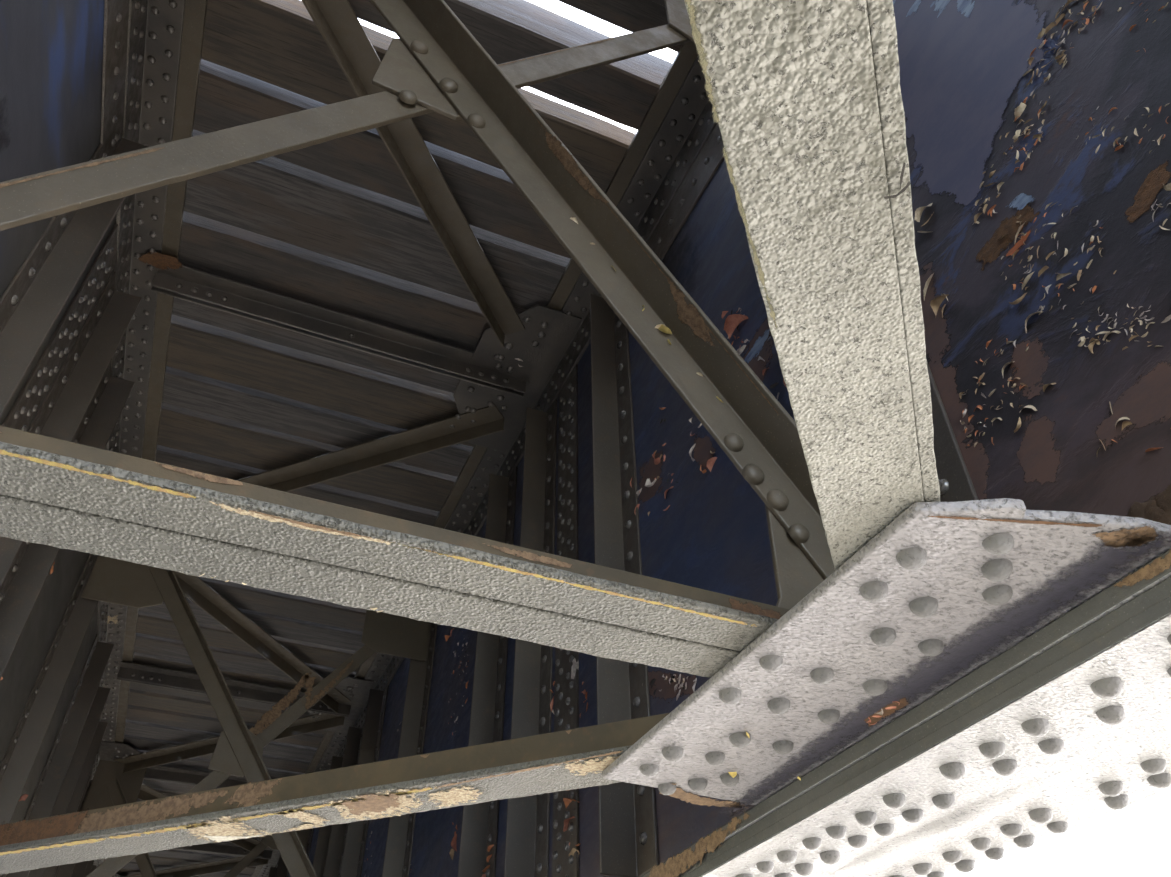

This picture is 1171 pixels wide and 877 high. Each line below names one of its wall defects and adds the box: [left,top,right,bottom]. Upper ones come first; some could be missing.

peeling [892,0,1103,233]
peeling [1076,103,1170,153]
peeling [1151,183,1171,230]
peeling [721,307,787,400]
peeling [920,202,1171,500]
peeling [689,418,717,474]
rust [928,484,1171,548]
rust [1114,550,1171,588]
peeling [557,755,621,776]
peeling [184,785,482,877]
peeling [563,798,581,856]
rust [647,783,750,877]